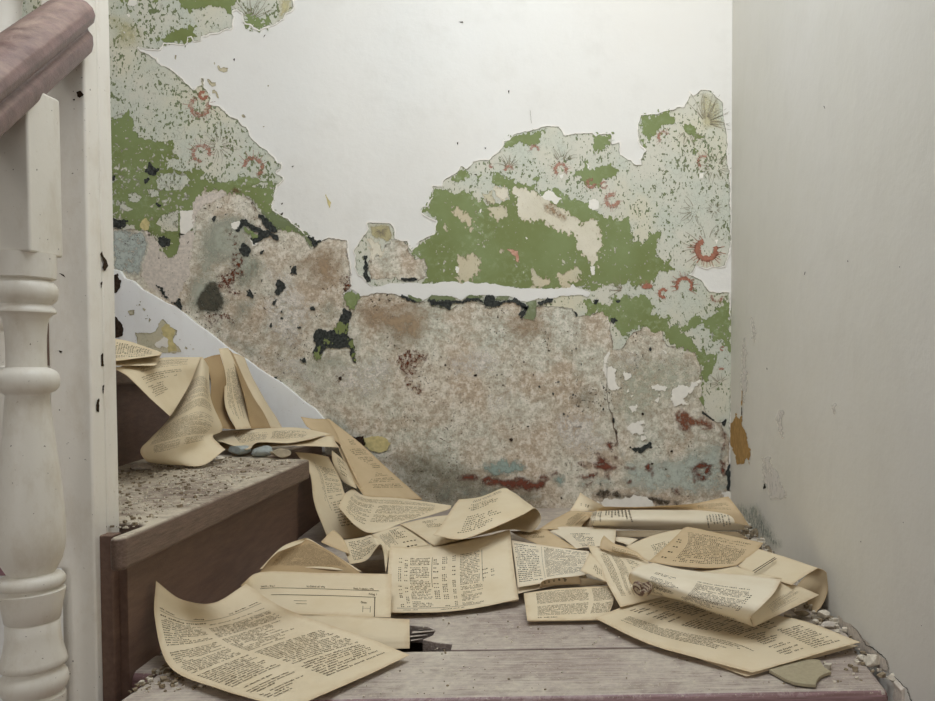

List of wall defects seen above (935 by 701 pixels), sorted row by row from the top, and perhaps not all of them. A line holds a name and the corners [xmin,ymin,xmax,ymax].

flaking render [100,0,751,509]